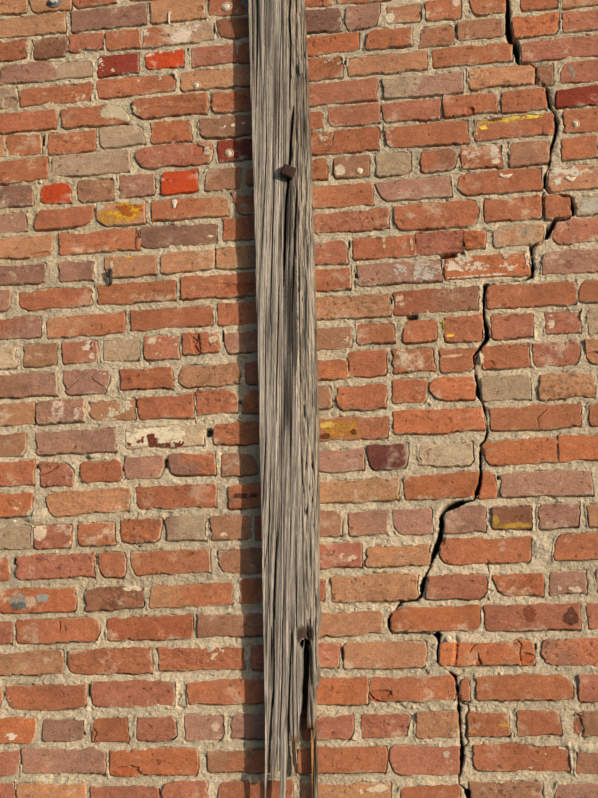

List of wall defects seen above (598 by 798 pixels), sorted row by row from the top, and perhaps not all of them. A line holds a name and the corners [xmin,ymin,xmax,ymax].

crack [505,0,575,282]
crack [387,285,490,634]
crack [433,632,471,798]